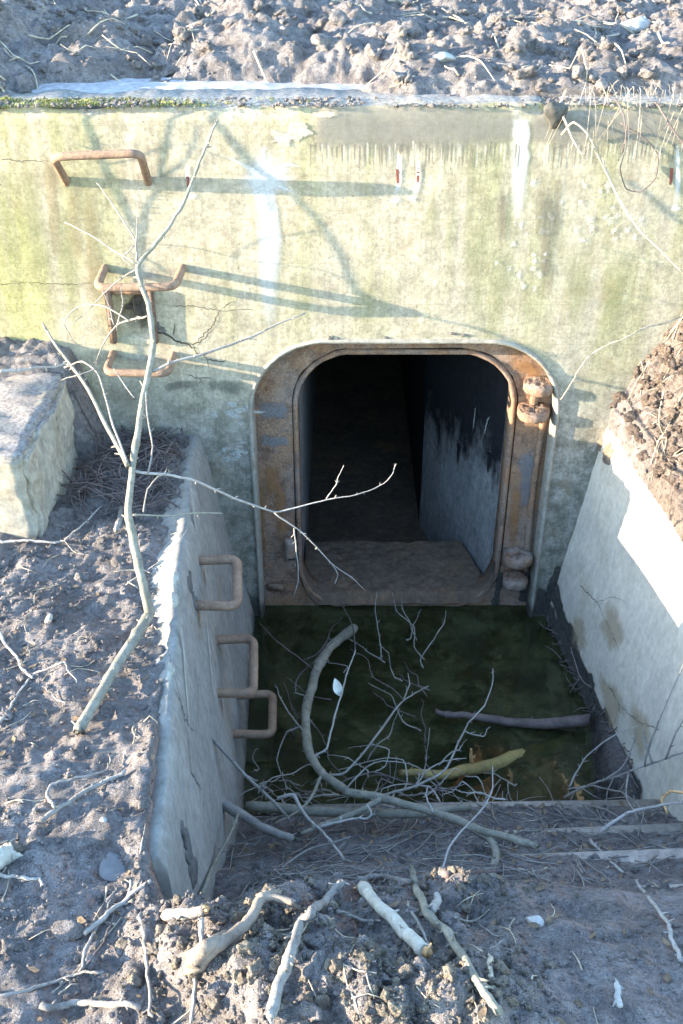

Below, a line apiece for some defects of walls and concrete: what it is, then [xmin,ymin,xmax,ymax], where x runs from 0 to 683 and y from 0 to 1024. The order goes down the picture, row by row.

leakage [310,110,683,193]
crack [158,301,250,380]
rust [259,469,287,551]